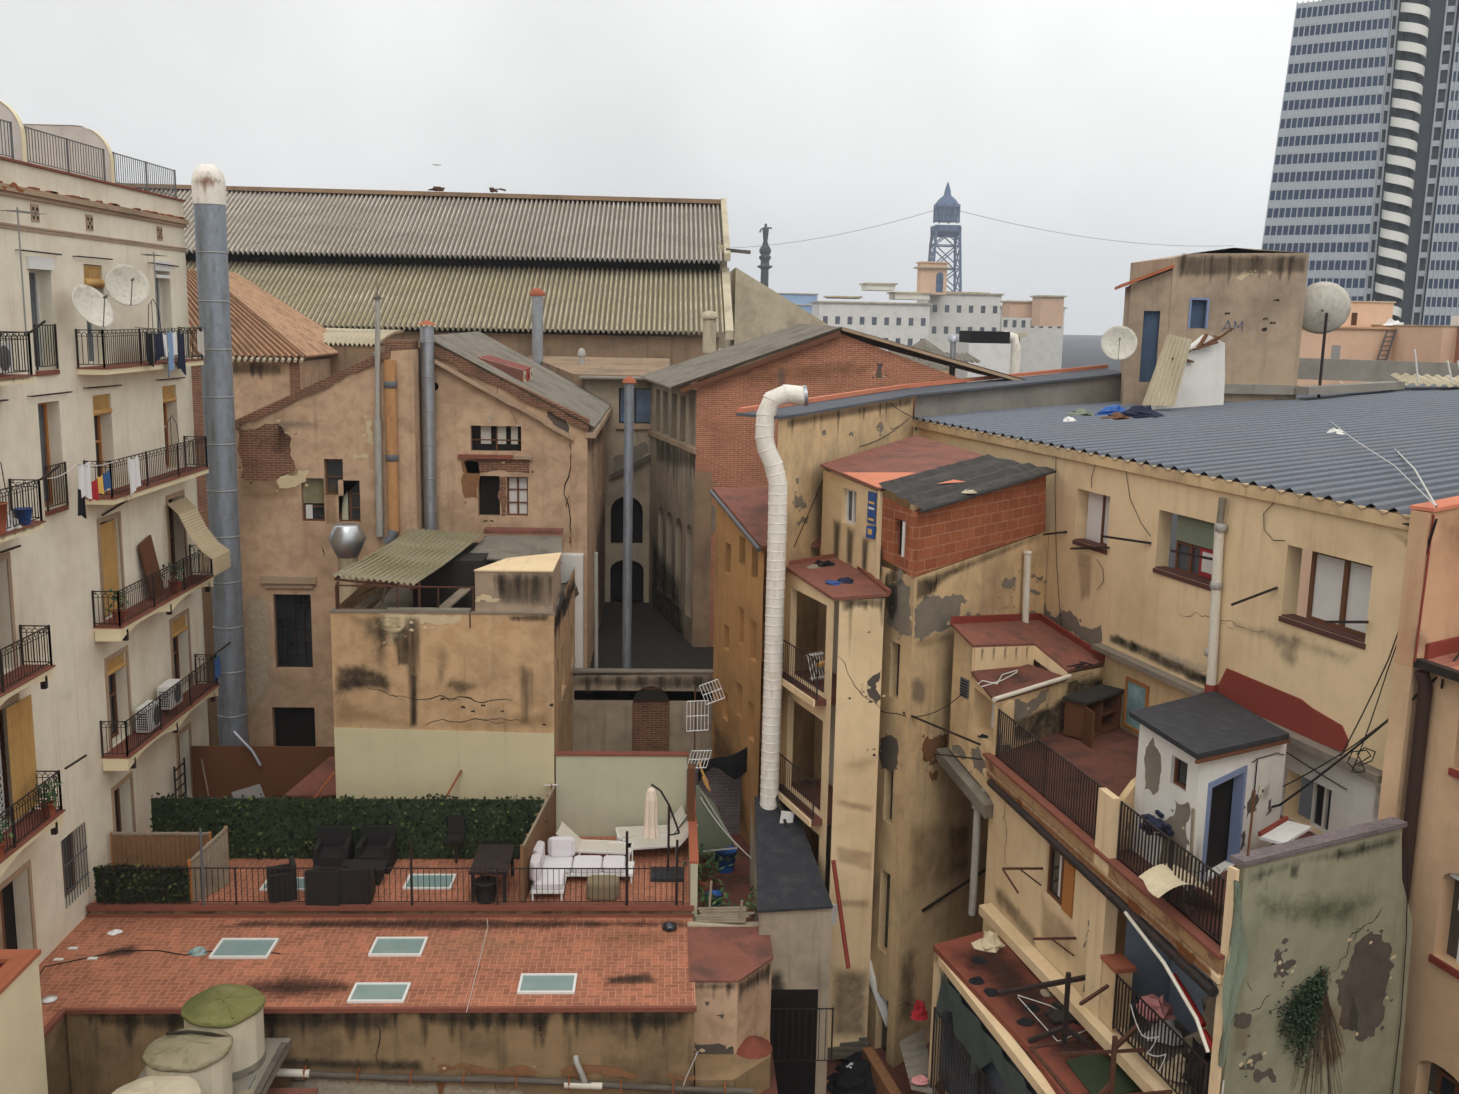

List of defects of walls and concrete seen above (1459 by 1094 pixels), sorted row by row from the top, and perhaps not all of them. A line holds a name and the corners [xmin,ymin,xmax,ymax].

peeling [237,419,310,492]
peeling [887,569,980,642]
water stain [338,667,388,690]
water stain [374,620,418,724]
crack [373,689,518,725]
peeling [1144,738,1161,795]
peeling [1159,800,1191,888]
peeling [1335,929,1396,1042]
water stain [90,1014,184,1039]
water stain [421,1013,546,1042]
water stain [564,1013,681,1037]
water stain [283,1060,494,1094]